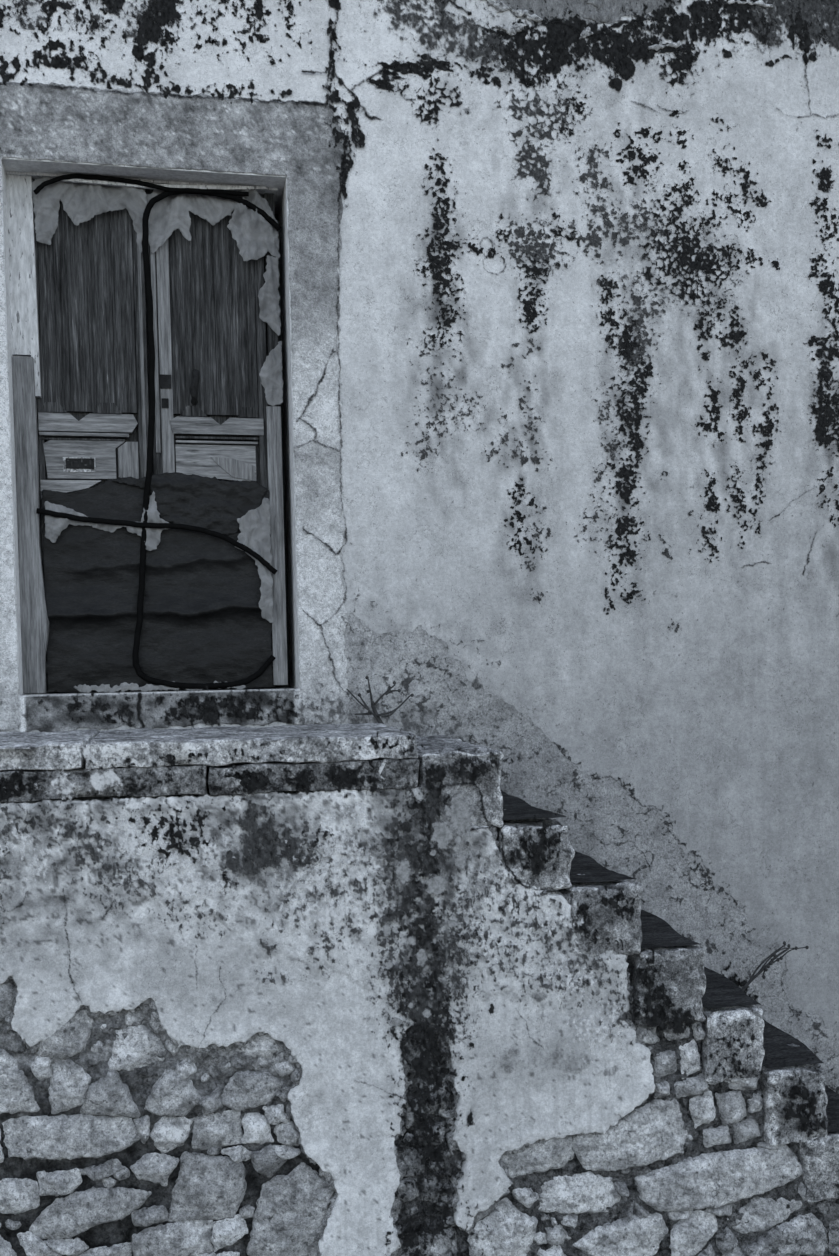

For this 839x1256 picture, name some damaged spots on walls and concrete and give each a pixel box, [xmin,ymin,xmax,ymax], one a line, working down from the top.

water stain [39,0,187,66]
water stain [244,0,265,20]
crack [448,0,671,37]
water stain [708,0,839,67]
crack [0,0,409,706]
crack [136,692,145,728]
flaking render [301,589,839,1094]
water stain [0,683,767,1256]
flaking render [394,1002,839,1256]